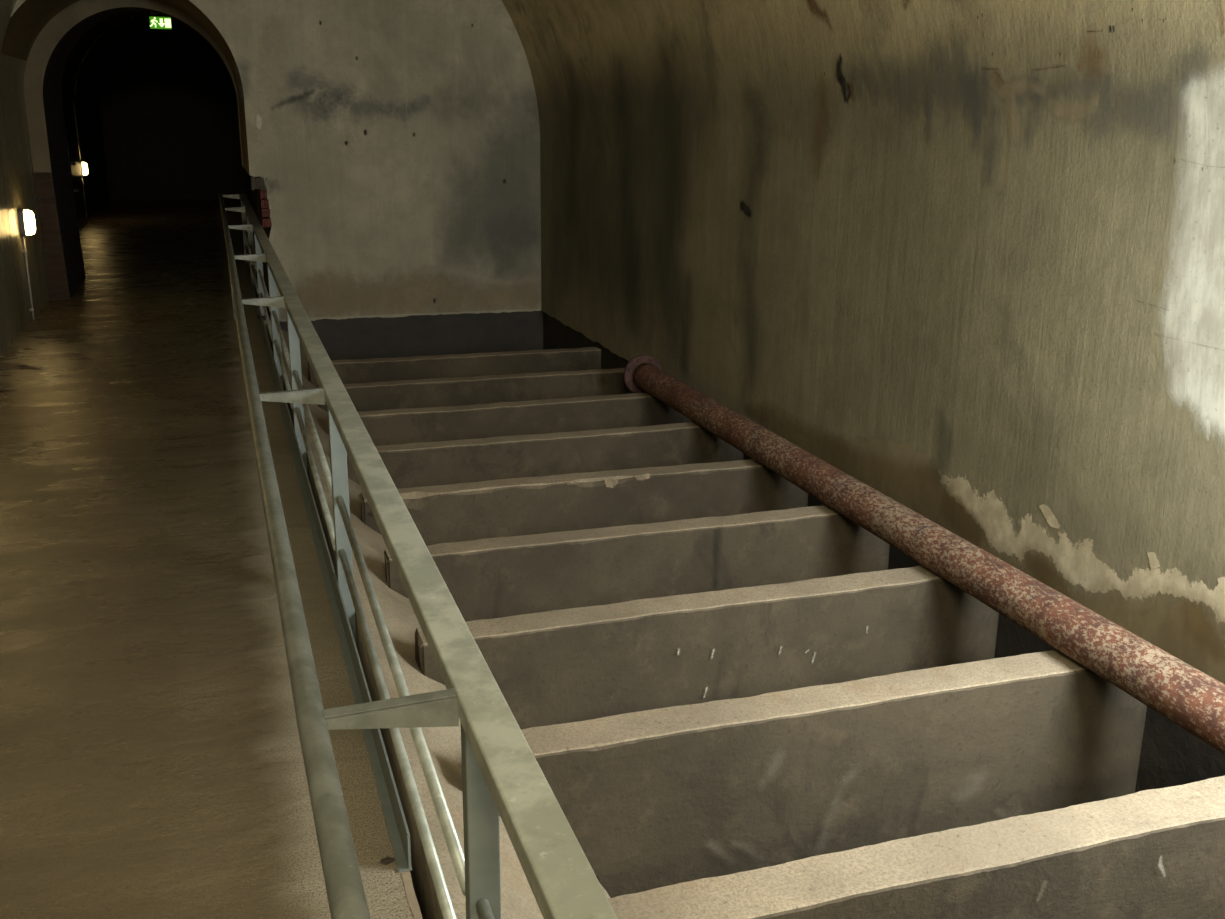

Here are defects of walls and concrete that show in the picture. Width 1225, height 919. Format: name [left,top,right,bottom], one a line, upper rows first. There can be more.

spalling [543,312,629,369]
spalling [807,494,826,507]
flaking render [838,439,1225,625]
spalling [994,613,1056,658]
spalling [1135,706,1225,793]